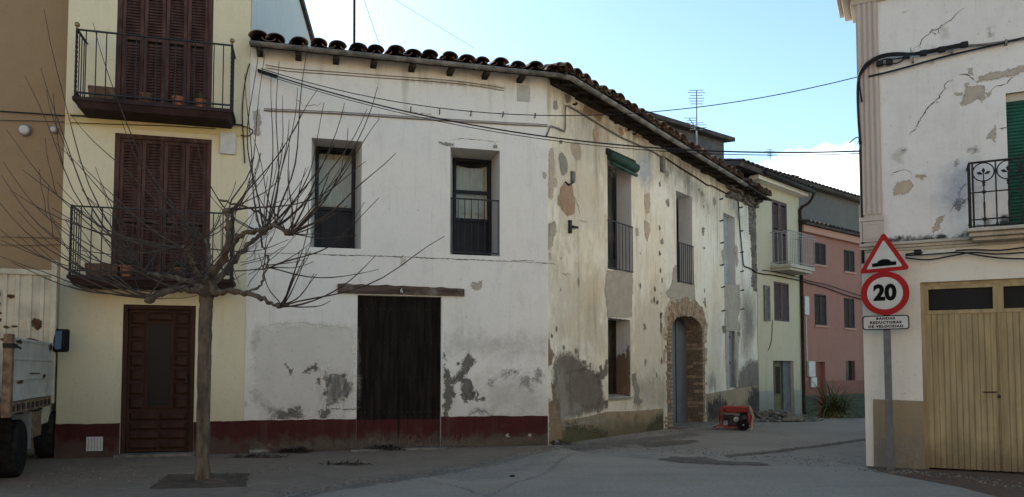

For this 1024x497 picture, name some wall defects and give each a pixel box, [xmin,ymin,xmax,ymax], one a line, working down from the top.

crack [911,74,1013,132]
peeling [954,64,1024,106]
flaking render [542,140,582,216]
peeling [893,174,927,195]
peeling [932,198,965,232]
peeling [548,326,602,374]
peeling [284,362,354,419]
peeling [442,354,486,417]
peeling [549,382,562,445]